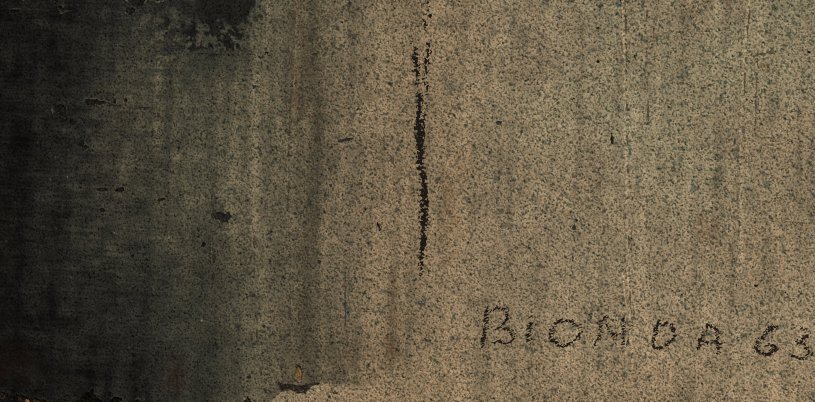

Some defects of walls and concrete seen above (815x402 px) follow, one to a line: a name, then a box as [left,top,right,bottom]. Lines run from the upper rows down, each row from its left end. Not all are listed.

crack [624,0,650,144]
peeling [276,364,363,399]